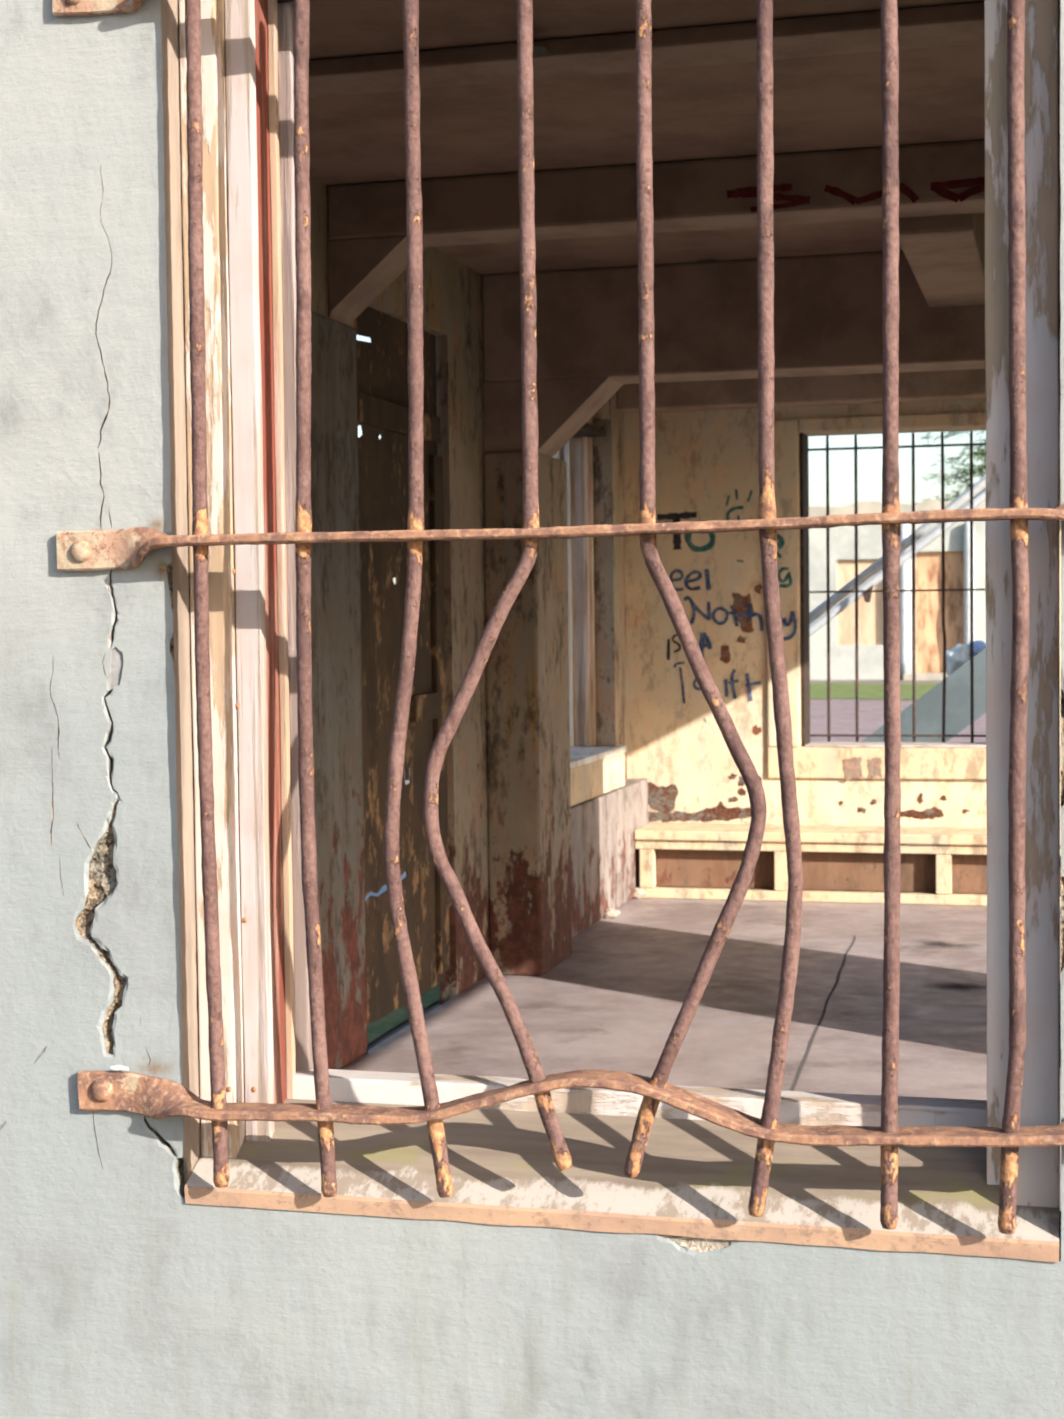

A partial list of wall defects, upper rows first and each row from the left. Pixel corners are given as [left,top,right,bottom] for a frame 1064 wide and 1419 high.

crack [95,168,112,529]
crack [50,569,151,1067]
peeling [648,773,762,822]
peeling [842,757,883,780]
peeling [901,793,949,819]
crack [790,935,856,1091]
crack [144,1116,188,1200]
peeling [660,1235,733,1252]